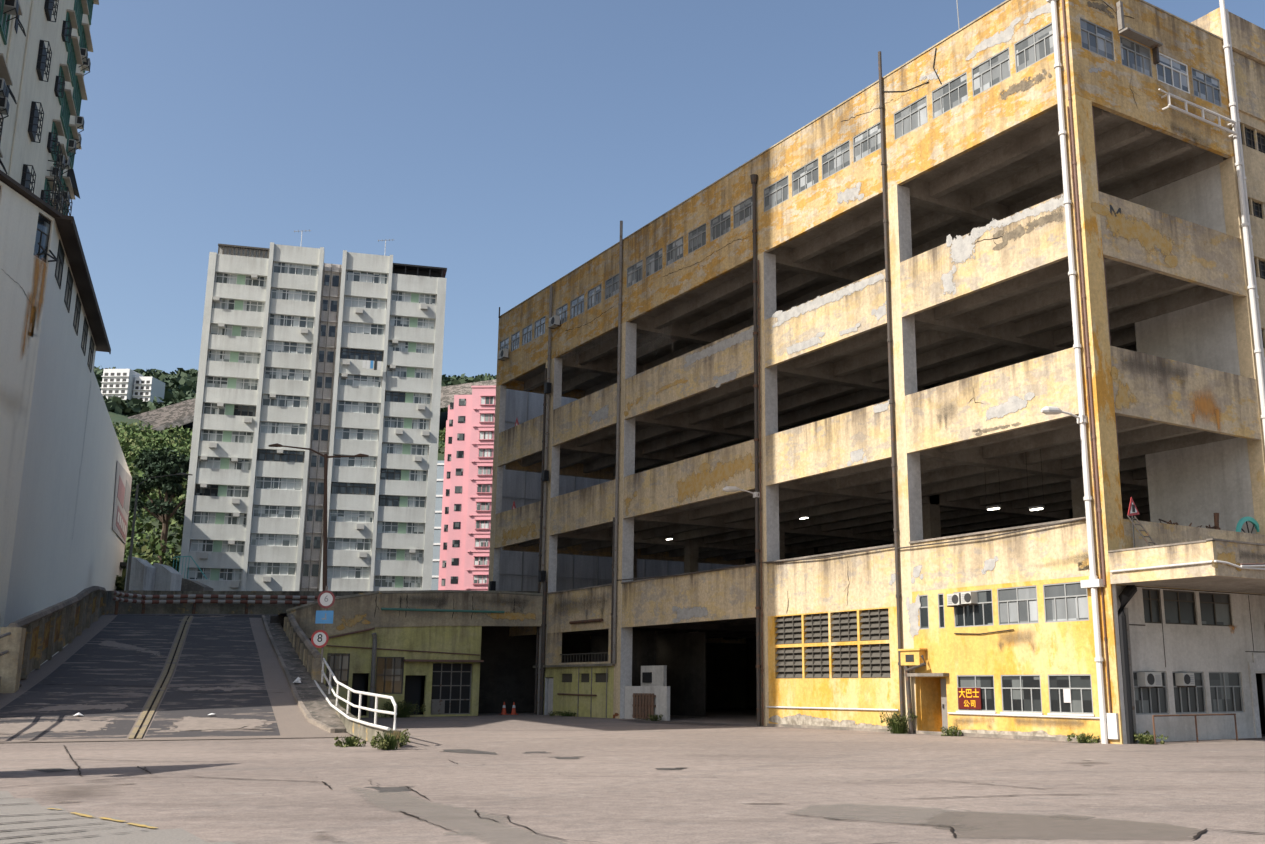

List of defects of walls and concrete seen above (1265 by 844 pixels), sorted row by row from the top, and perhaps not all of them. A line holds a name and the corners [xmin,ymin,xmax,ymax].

peeling [965,3,1051,60]
peeling [941,194,1065,295]
rust [23,258,46,352]
peeling [973,392,1035,436]